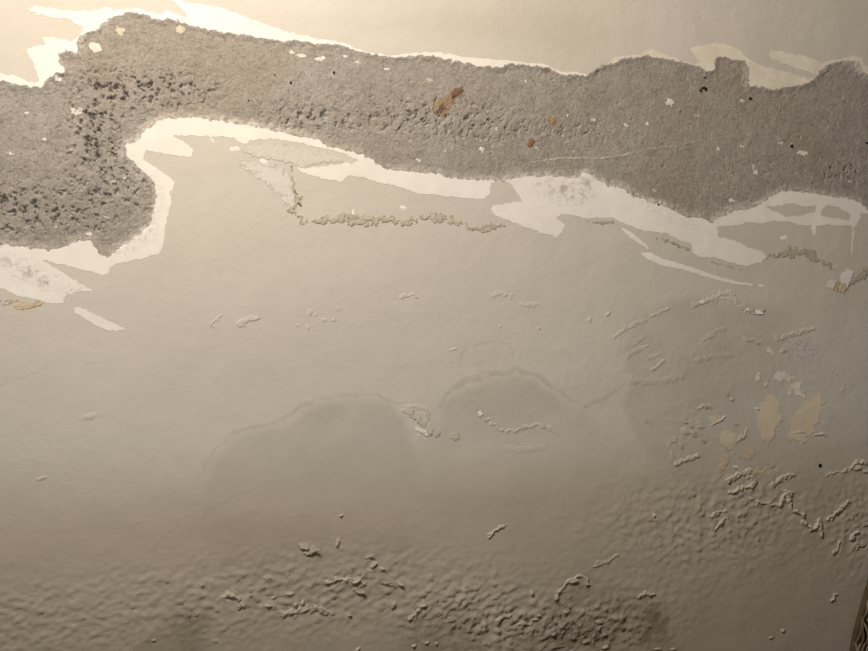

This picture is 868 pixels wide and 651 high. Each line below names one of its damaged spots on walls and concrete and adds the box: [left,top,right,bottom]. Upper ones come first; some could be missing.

rust [432,87,464,118]
spalling [0,0,868,316]
peeling [74,307,124,331]
peeling [666,371,826,467]